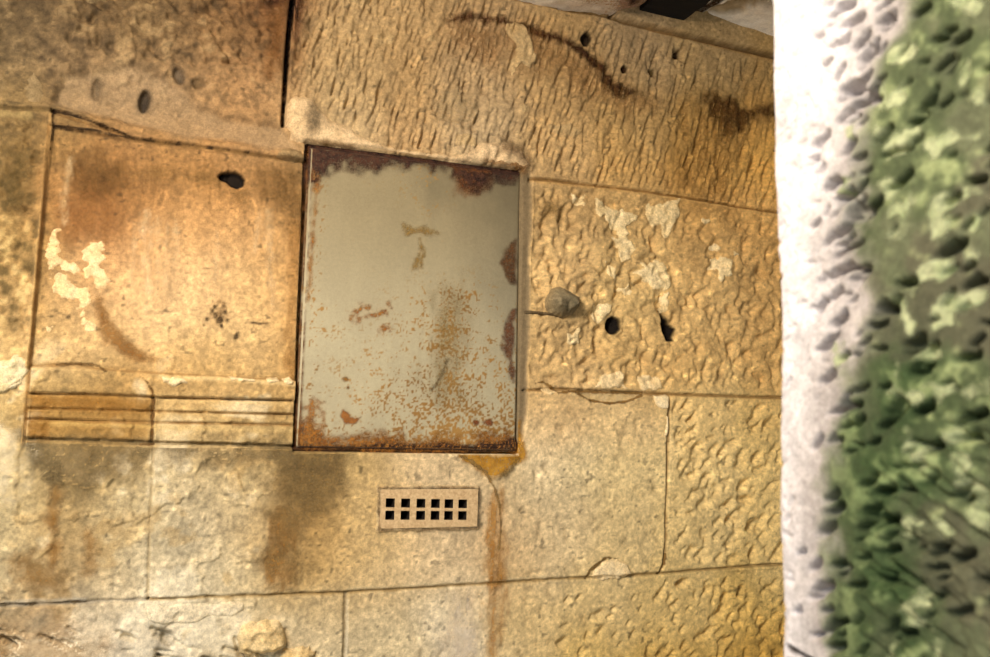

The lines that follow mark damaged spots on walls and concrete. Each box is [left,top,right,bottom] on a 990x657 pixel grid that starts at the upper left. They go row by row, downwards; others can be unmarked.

water stain [449,11,508,24]
water stain [522,23,635,98]
water stain [703,95,775,135]
rust [302,141,525,298]
rust [349,303,389,331]
peeling [0,354,29,393]
rust [291,309,526,477]
water stain [25,442,148,528]
water stain [206,445,342,584]
rust [486,493,503,657]